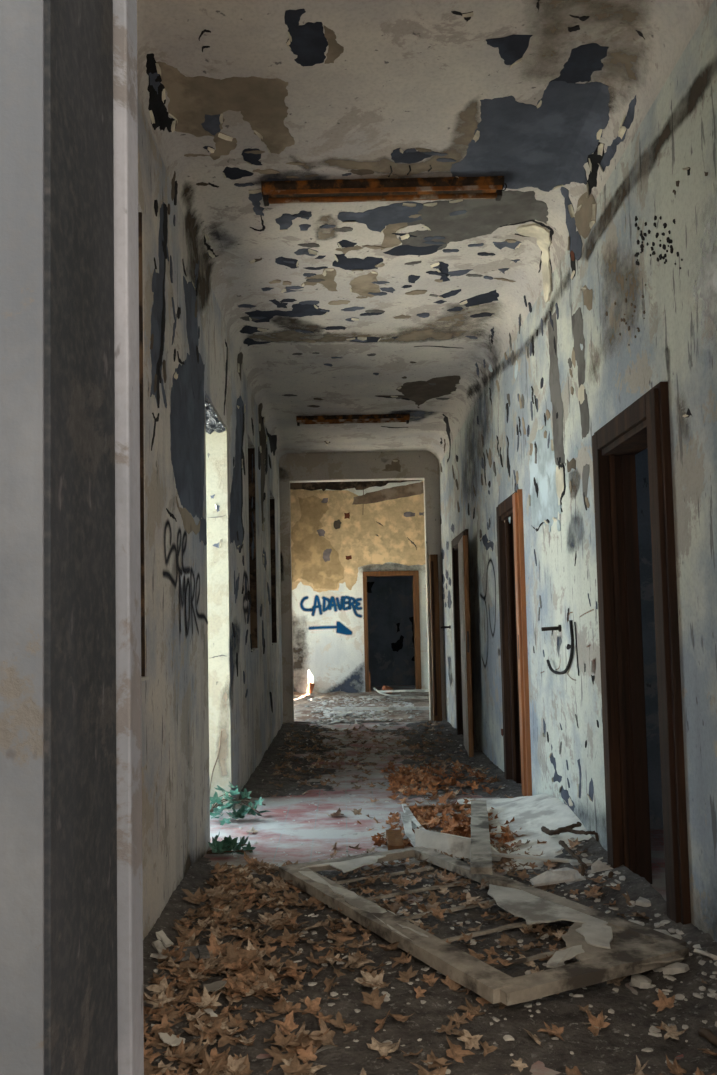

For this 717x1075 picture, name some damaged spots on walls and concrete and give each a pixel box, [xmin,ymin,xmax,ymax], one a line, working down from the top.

peeling [284,9,344,67]
peeling [486,35,533,69]
leakage [529,0,645,82]
peeling [146,43,636,553]
peeling [290,481,426,593]